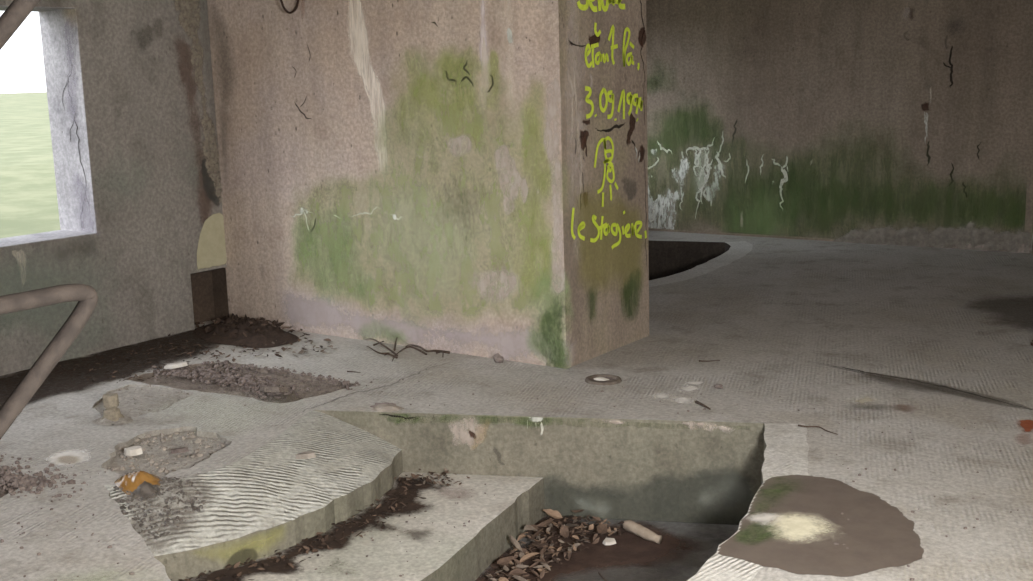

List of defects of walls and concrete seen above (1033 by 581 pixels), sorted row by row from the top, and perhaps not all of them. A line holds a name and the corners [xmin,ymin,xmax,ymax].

water stain [350,0,387,172]
crack [943,45,953,88]
water stain [648,132,731,230]
water stain [745,158,788,208]
water stain [975,298,1033,327]
spalling [452,419,484,446]